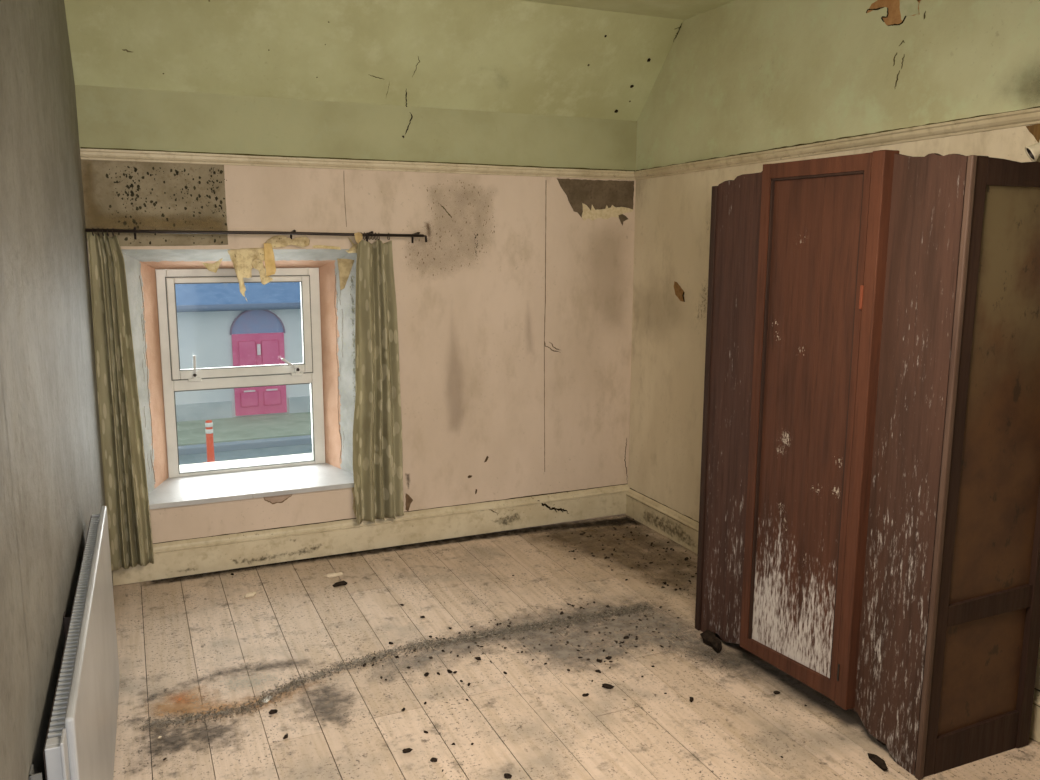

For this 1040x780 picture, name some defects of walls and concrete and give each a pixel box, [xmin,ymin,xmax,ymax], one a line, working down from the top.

peeling [866,0,921,26]
crack [893,40,905,87]
crack [370,57,420,138]
peeling [1026,124,1040,143]
peeling [557,178,634,226]
peeling [264,494,292,504]